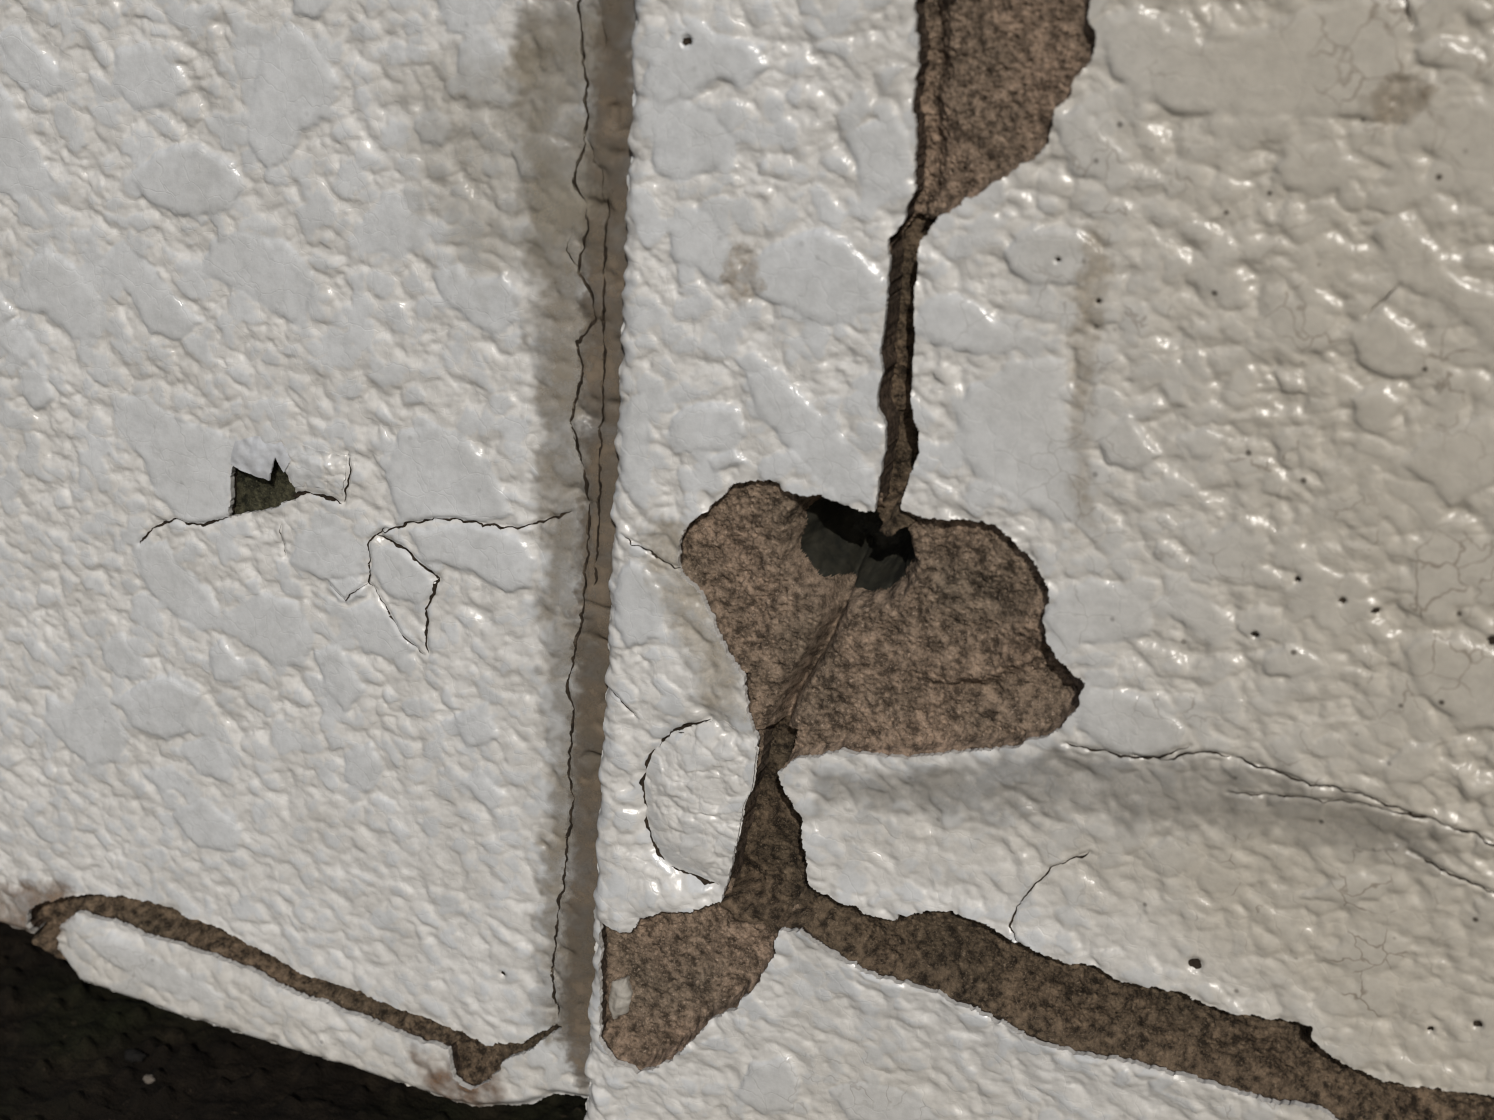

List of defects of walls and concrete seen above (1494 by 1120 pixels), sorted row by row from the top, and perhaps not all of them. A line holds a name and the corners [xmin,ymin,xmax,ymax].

spalling [889,0,1096,251]
peeling [230,436,347,515]
crack [30,0,681,1086]
spalling [680,479,1085,778]
crack [877,212,936,537]
spalling [601,873,779,1071]
crack [613,692,1494,1120]